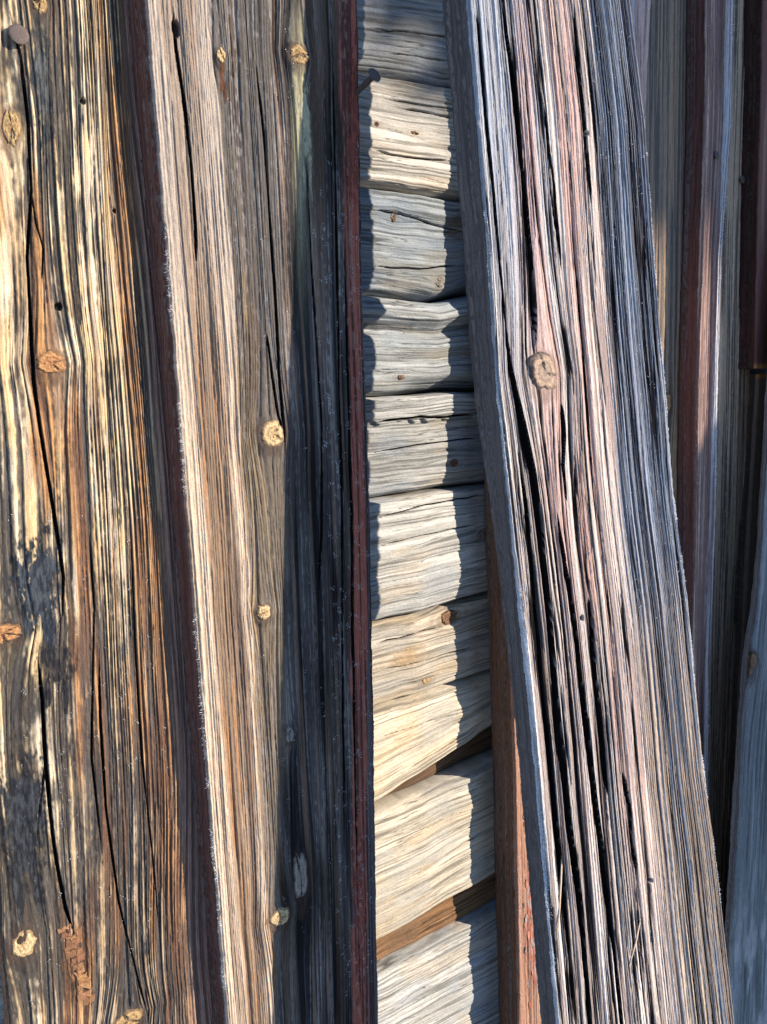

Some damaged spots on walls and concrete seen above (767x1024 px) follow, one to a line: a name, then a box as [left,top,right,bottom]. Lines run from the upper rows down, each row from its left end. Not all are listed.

crack [37,666,74,933]